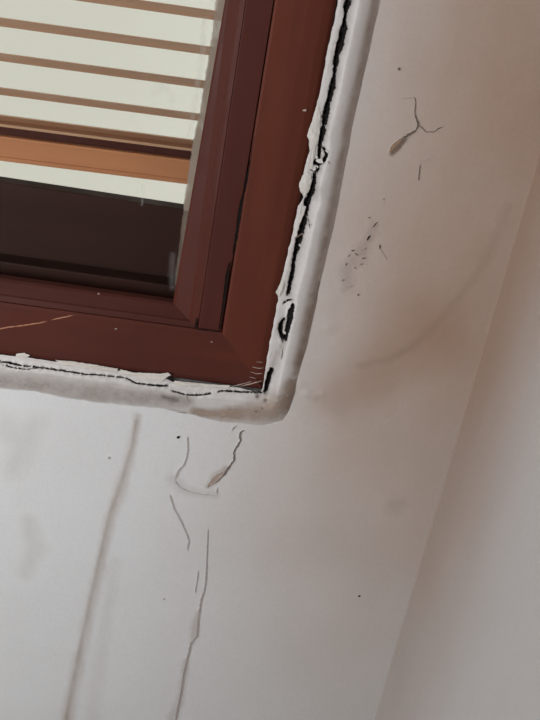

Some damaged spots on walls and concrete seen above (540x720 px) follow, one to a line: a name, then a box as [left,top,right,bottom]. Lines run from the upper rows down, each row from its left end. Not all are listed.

peeling [299,103,323,196]
crack [388,97,444,155]
peeling [56,360,230,389]
crack [169,425,245,550]
crack [174,532,208,720]